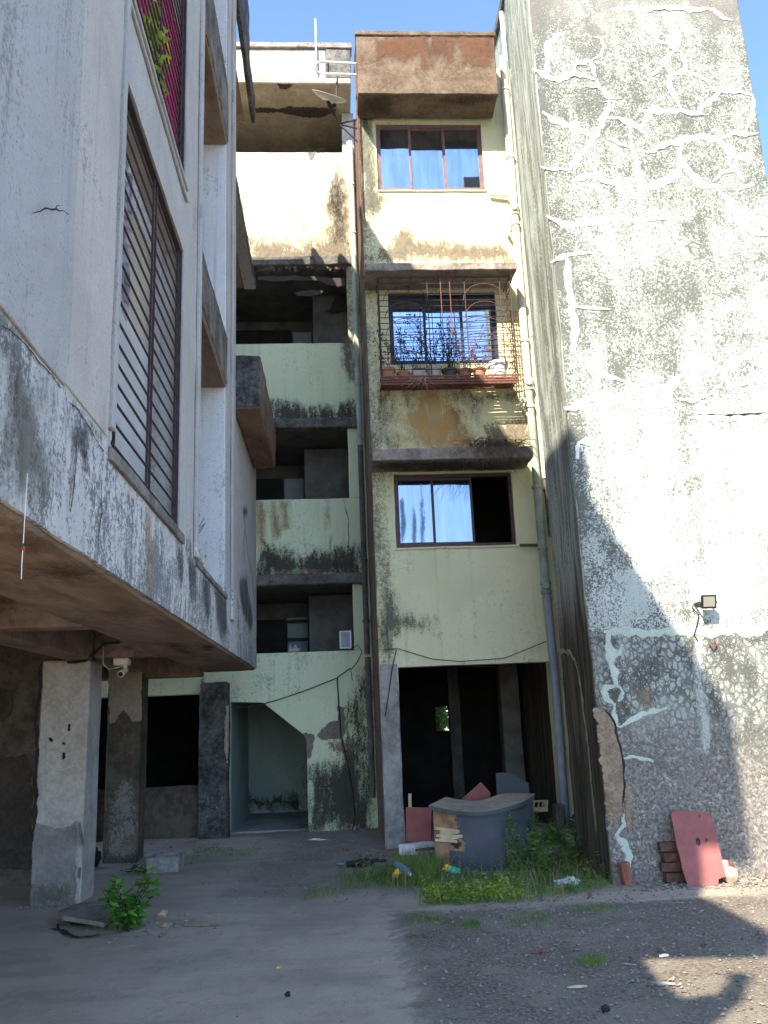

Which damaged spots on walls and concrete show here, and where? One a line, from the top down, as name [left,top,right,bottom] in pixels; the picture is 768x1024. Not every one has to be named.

corrosion [375,36,492,68]
crack [532,5,768,236]
crack [33,205,68,214]
damp [248,97,393,271]
damp [364,225,514,263]
crack [546,215,768,416]
damp [163,547,227,655]
damp [240,540,362,630]
peeling [108,668,143,724]
mould [249,668,376,832]
peeling [303,706,347,758]
flaking render [593,708,635,830]